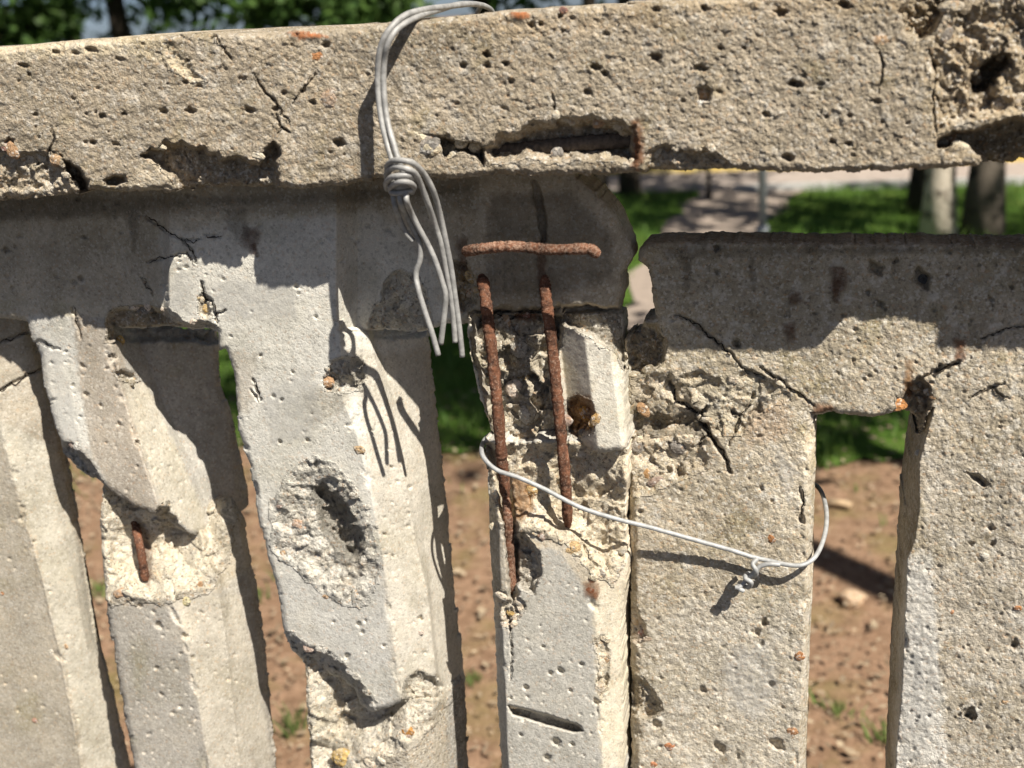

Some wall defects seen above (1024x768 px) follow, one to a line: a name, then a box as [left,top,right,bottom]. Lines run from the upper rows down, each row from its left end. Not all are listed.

crack [254,75,311,133]
spalling [413,110,731,172]
corrosion [632,121,643,167]
spalling [898,0,1024,161]
crack [143,217,226,321]
corrosion [569,396,591,430]
spalling [444,240,794,630]
crack [671,316,815,472]
crack [924,362,959,377]
spalling [63,441,240,608]
spalling [268,455,384,610]
corrosion [514,479,532,519]